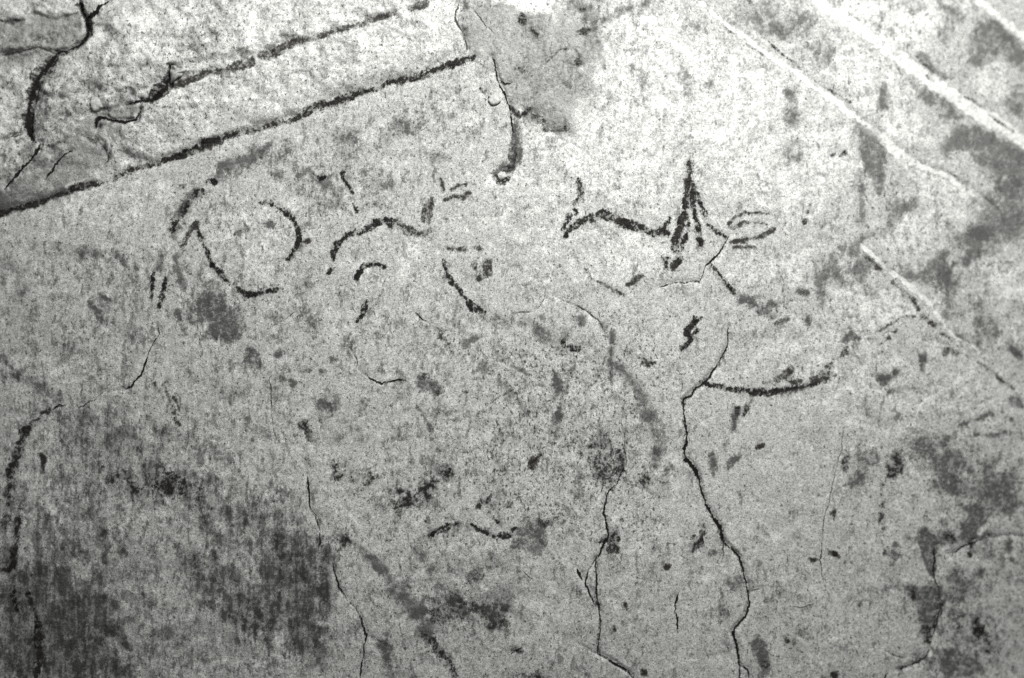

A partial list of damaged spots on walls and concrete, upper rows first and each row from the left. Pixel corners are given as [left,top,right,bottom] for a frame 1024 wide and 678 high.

crack [577,354,652,678]
crack [681,326,760,678]